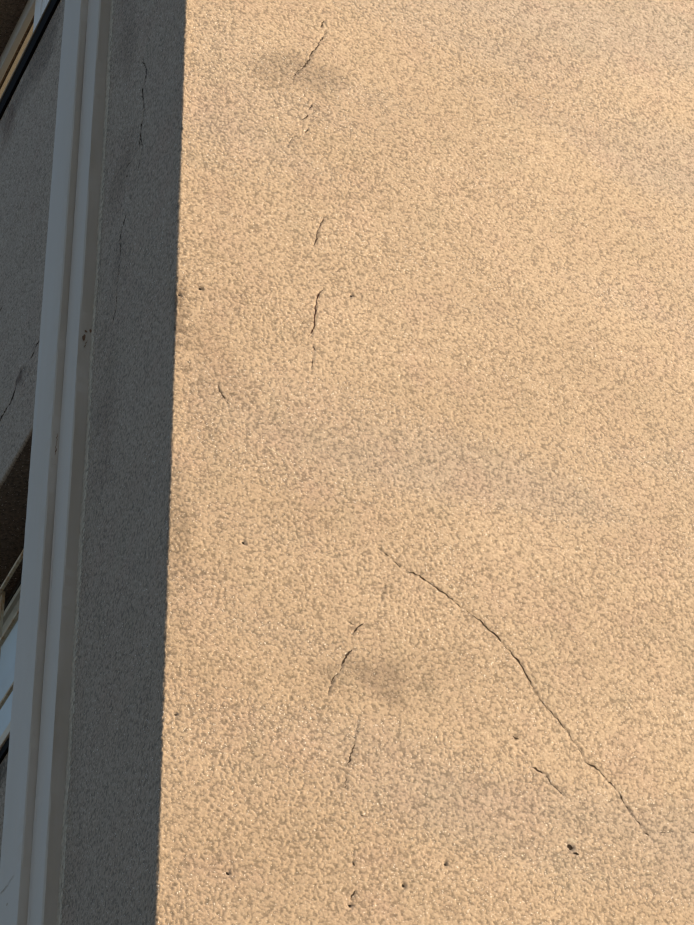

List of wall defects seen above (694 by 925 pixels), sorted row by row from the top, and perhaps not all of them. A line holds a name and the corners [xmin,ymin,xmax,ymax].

crack [291,20,325,78]
crack [301,269,340,366]
crack [328,622,363,693]
crack [379,549,665,839]